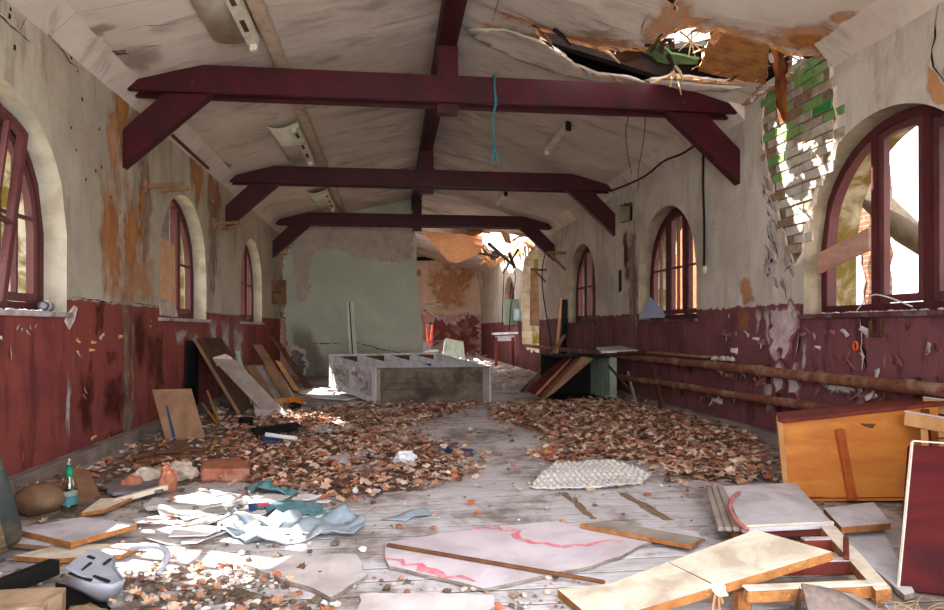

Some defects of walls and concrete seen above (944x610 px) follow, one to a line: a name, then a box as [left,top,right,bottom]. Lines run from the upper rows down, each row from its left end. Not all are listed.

crack [0,13,80,68]
spalling [566,25,725,59]
crack [929,3,944,85]
spalling [650,76,746,84]
peeling [926,65,944,106]
flaking render [716,44,887,404]
flaking render [280,226,422,302]
flaking render [280,304,310,377]
flaking render [426,310,481,356]
peeling [330,365,368,391]
peeling [698,394,735,407]